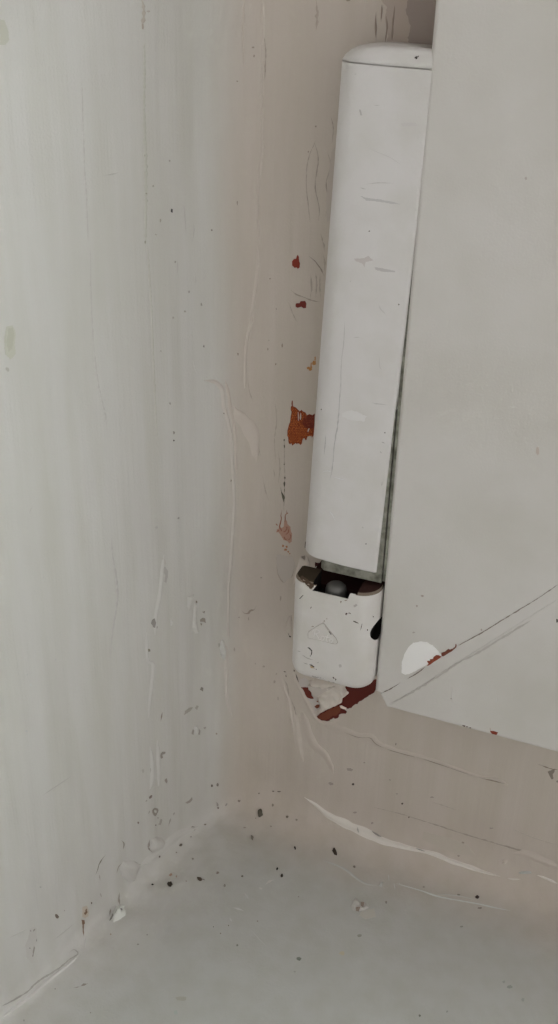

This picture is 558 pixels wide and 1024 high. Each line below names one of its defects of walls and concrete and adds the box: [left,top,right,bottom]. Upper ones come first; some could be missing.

peeling [299,678,349,714]